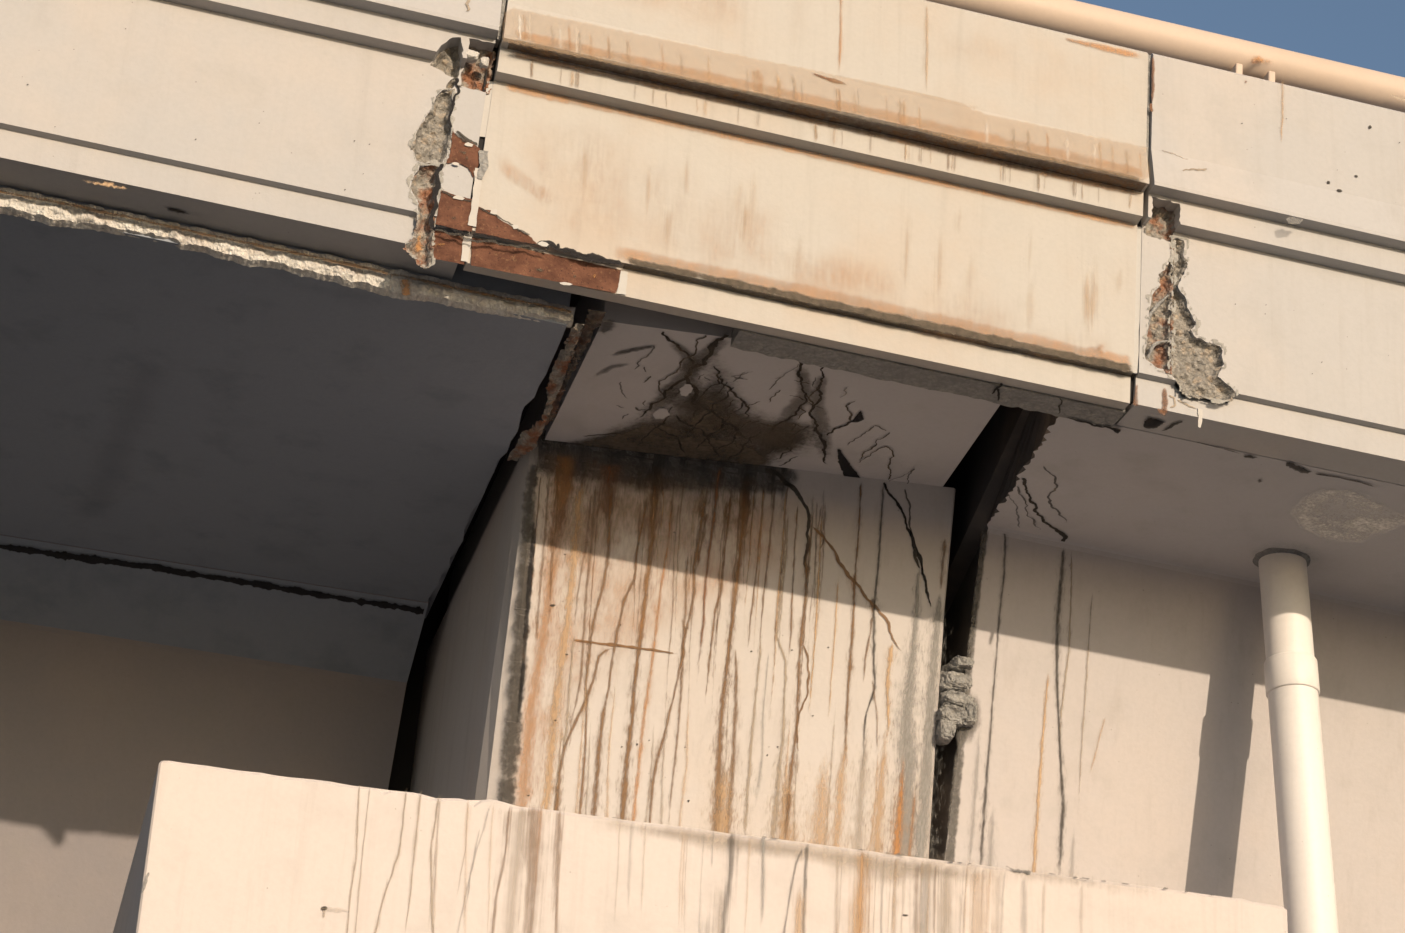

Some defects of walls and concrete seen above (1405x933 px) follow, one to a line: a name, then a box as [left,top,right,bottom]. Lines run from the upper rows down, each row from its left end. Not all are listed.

spalling [0,46,628,461]
rust [507,40,1146,193]
crack [992,383,1003,401]
spalling [1143,235,1238,404]
water stain [375,795,439,933]
rust [521,459,583,809]
water stain [498,341,822,892]
crack [574,332,931,834]
water stain [816,485,946,858]
water stain [945,726,966,862]
water stain [964,532,1006,864]
crack [1017,467,1072,864]